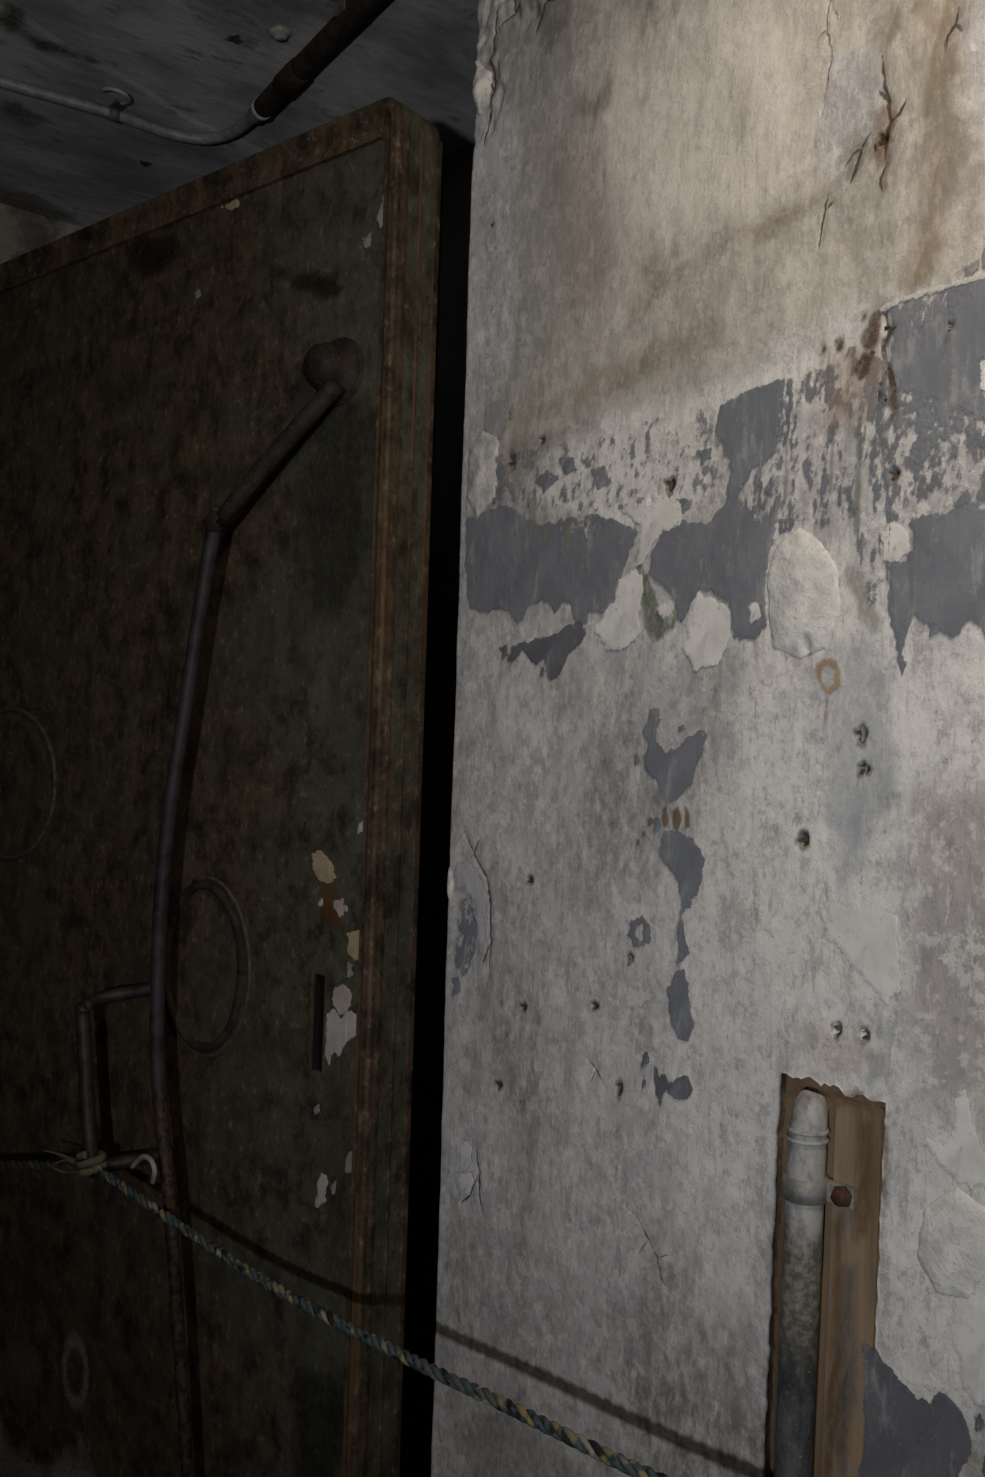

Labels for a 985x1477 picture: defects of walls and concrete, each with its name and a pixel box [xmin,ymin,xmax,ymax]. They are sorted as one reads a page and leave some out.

crack [819,55,907,245]
peeling [465,249,985,681]
rust [816,659,840,693]
peeling [634,708,708,802]
peeling [627,916,651,965]
peeling [651,817,705,1041]
flaking render [923,1088,985,1189]
peeling [857,1343,985,1477]